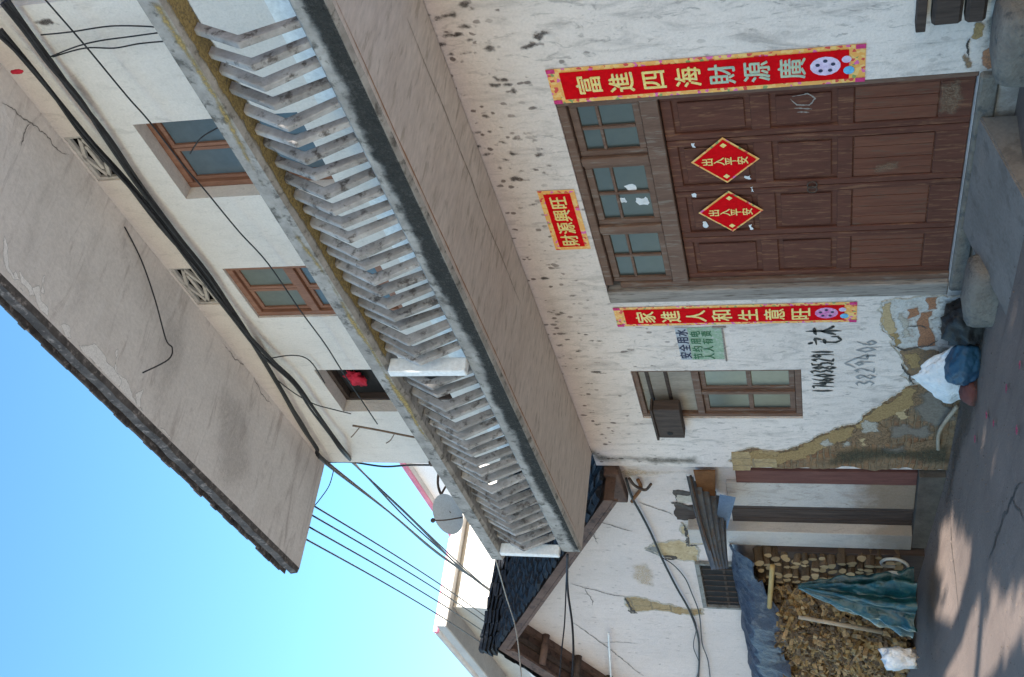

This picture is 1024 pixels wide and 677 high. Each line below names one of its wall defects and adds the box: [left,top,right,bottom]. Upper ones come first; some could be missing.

crack [3,103,69,155]
flaking render [728,295,961,471]
flaking render [644,490,704,562]
flaking render [624,596,705,616]